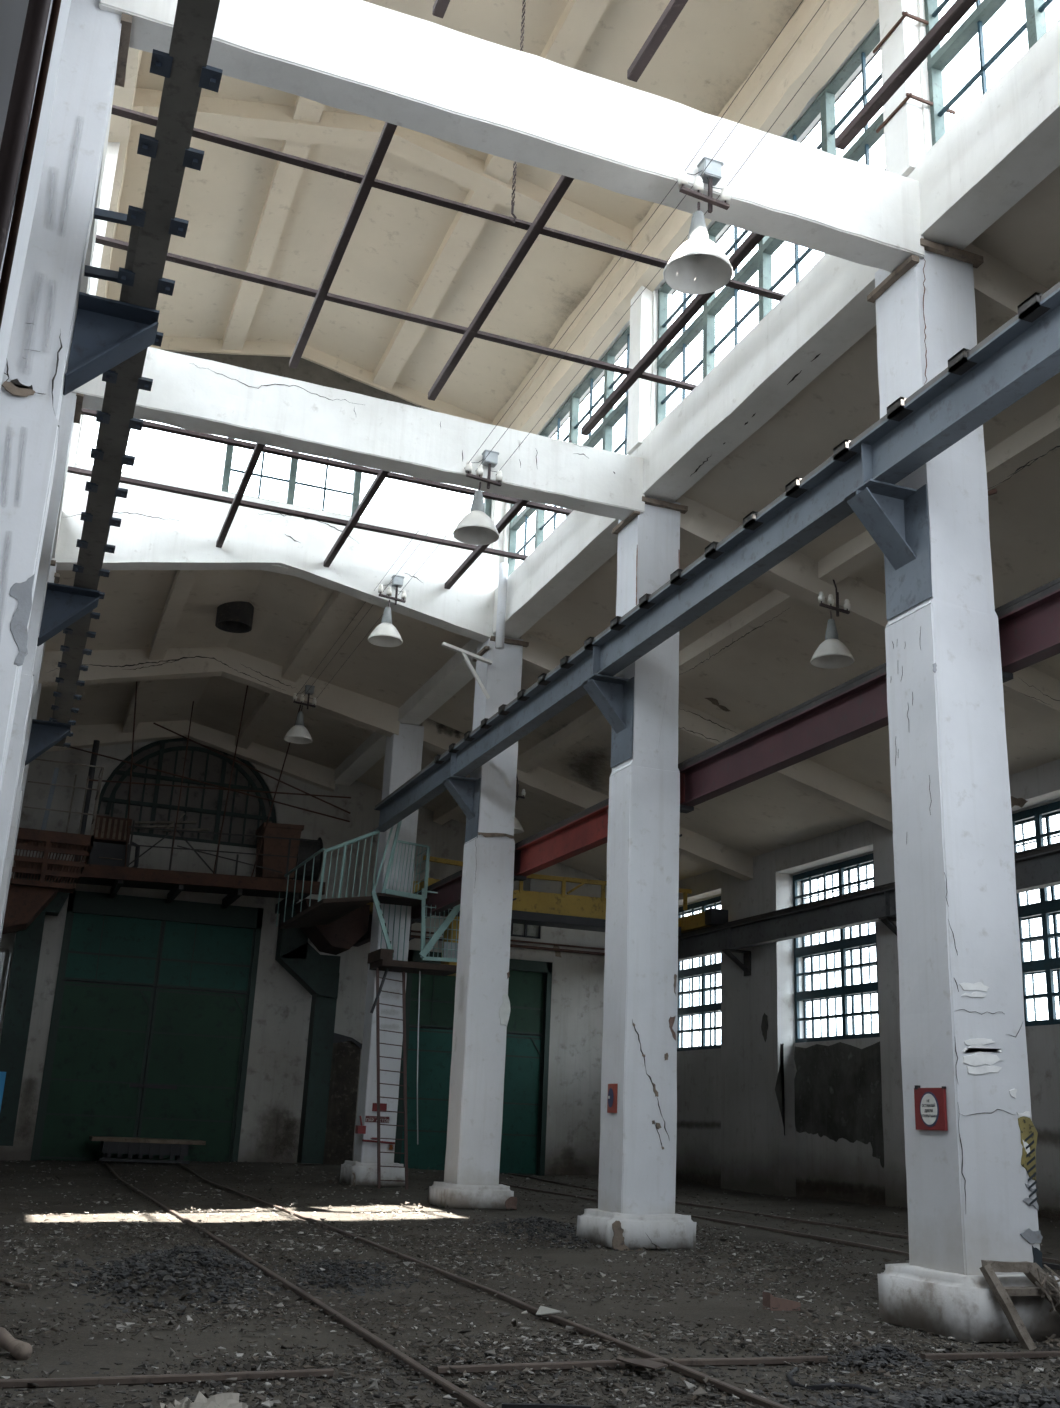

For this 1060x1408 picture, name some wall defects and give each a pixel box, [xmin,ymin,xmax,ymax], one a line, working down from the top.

spalling [1,358,43,397]
peeling [9,574,35,666]
peeling [959,982,989,998]
peeling [962,1038,1002,1075]
crack [632,1020,670,1150]